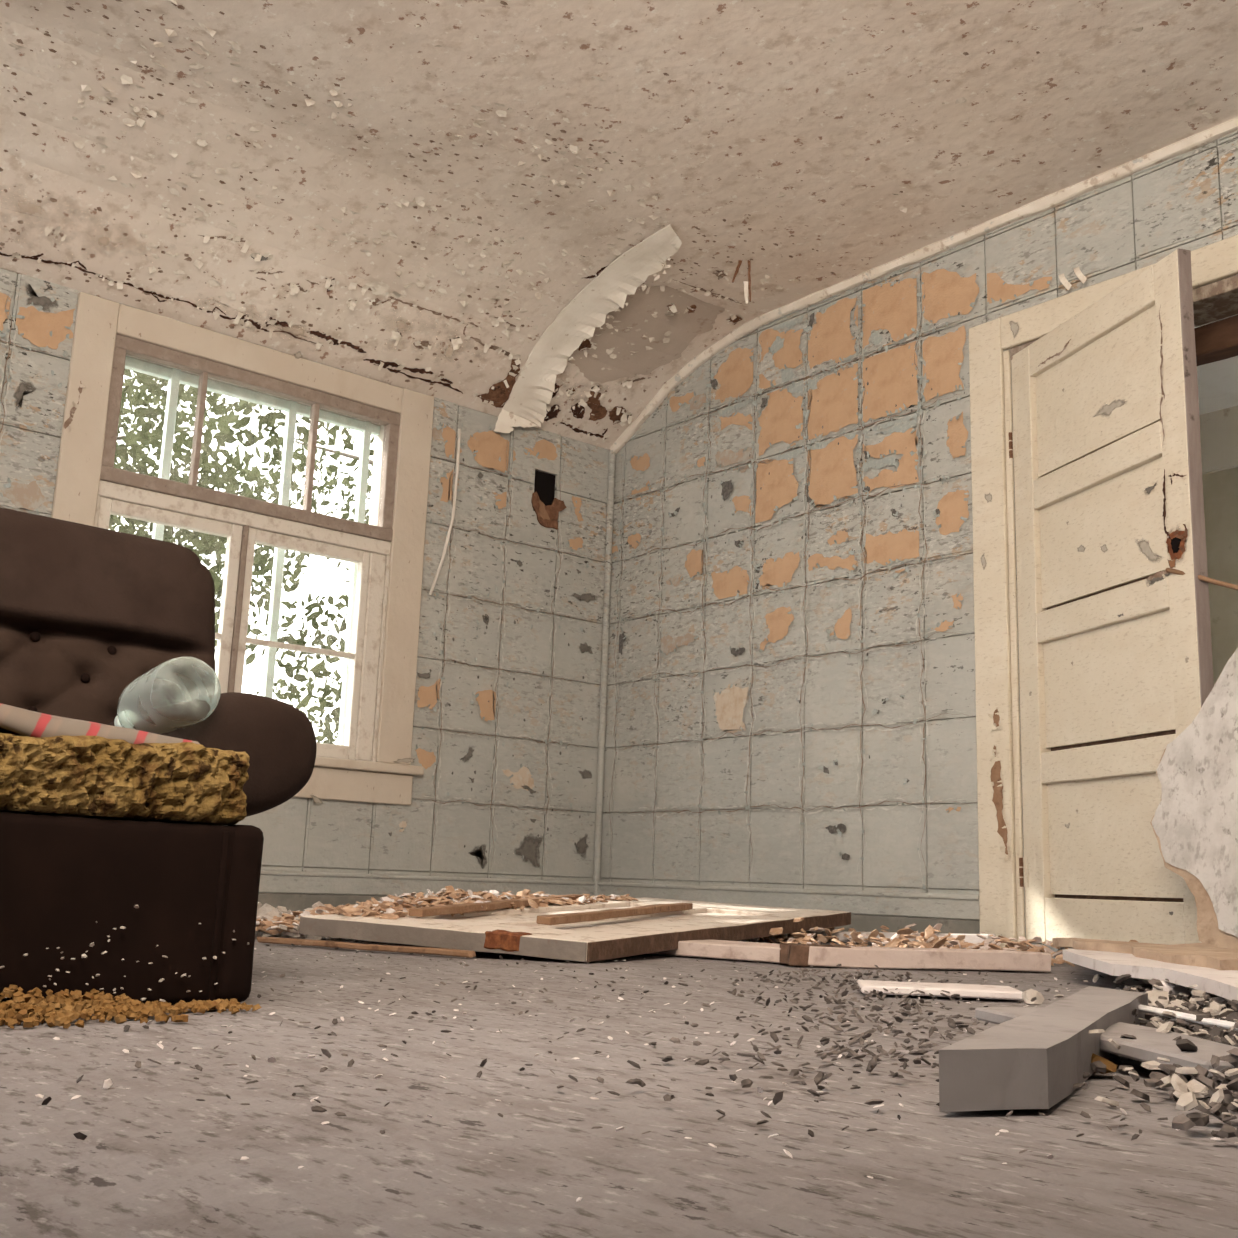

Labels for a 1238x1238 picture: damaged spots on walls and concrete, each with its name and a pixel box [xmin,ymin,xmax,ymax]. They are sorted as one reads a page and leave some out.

peeling [0,292,76,349]
peeling [432,422,591,530]
peeling [544,214,1052,661]
crack [0,226,976,889]
peeling [712,684,749,733]
peeling [988,708,1011,861]
spalling [825,823,850,860]